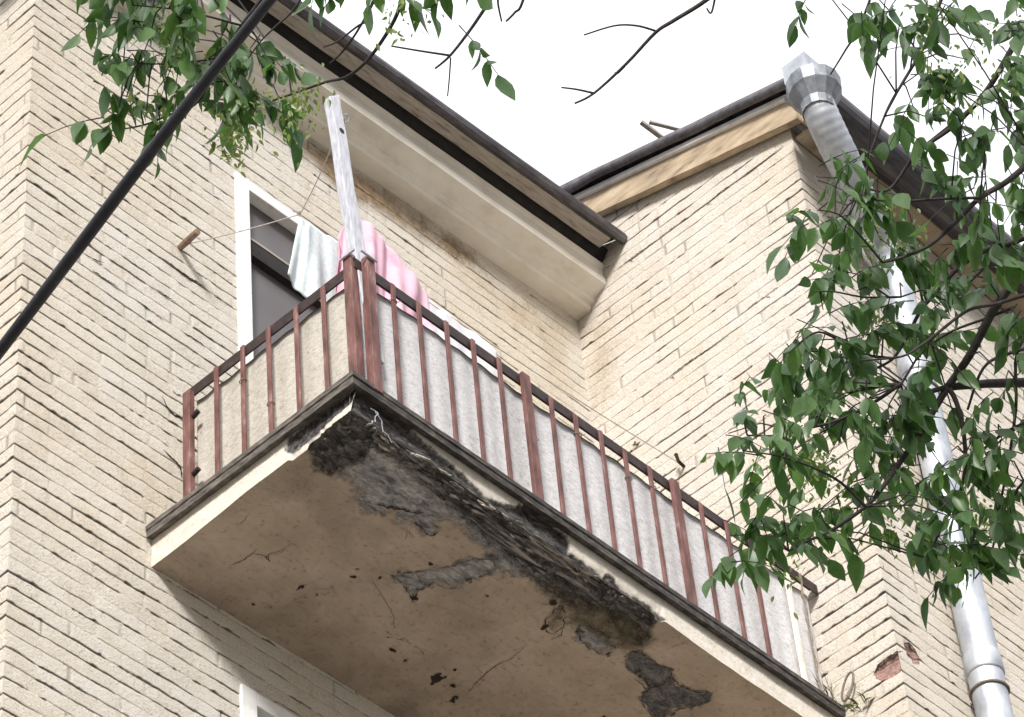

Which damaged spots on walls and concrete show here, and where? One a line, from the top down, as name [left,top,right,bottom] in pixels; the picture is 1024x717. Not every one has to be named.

spalling [285,390,712,717]
spalling [874,642,920,681]